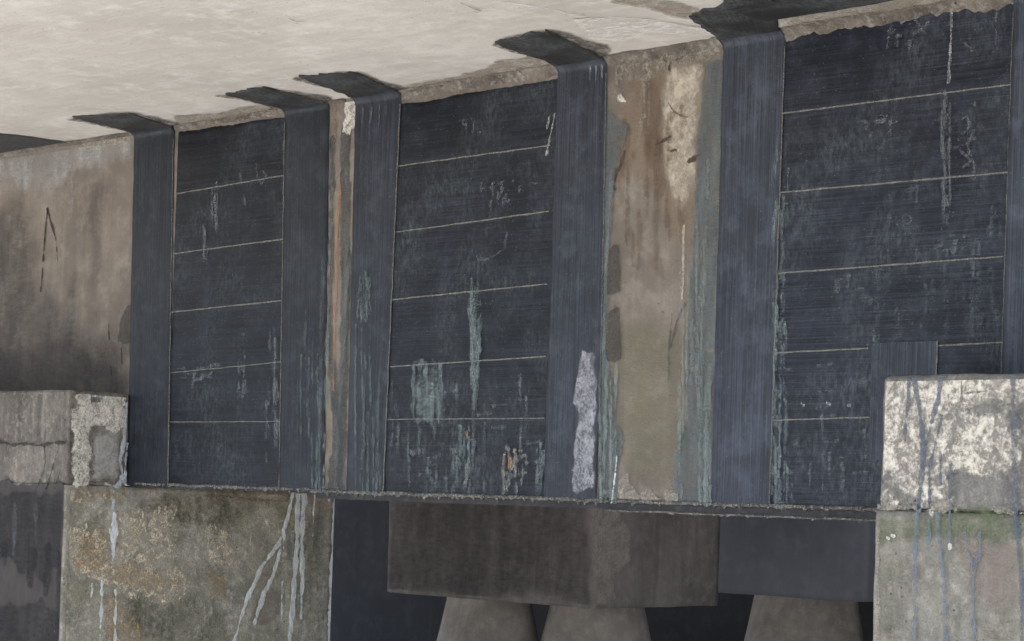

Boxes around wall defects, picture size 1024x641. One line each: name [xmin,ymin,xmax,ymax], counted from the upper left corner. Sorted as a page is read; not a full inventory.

peeling [71,394,126,488]
leakage [91,580,117,641]
leakage [233,126,371,641]
rust [333,179,342,391]
leakage [598,111,633,503]
leakage [644,60,723,505]
leakage [903,377,953,641]
leakage [1012,459,1024,641]